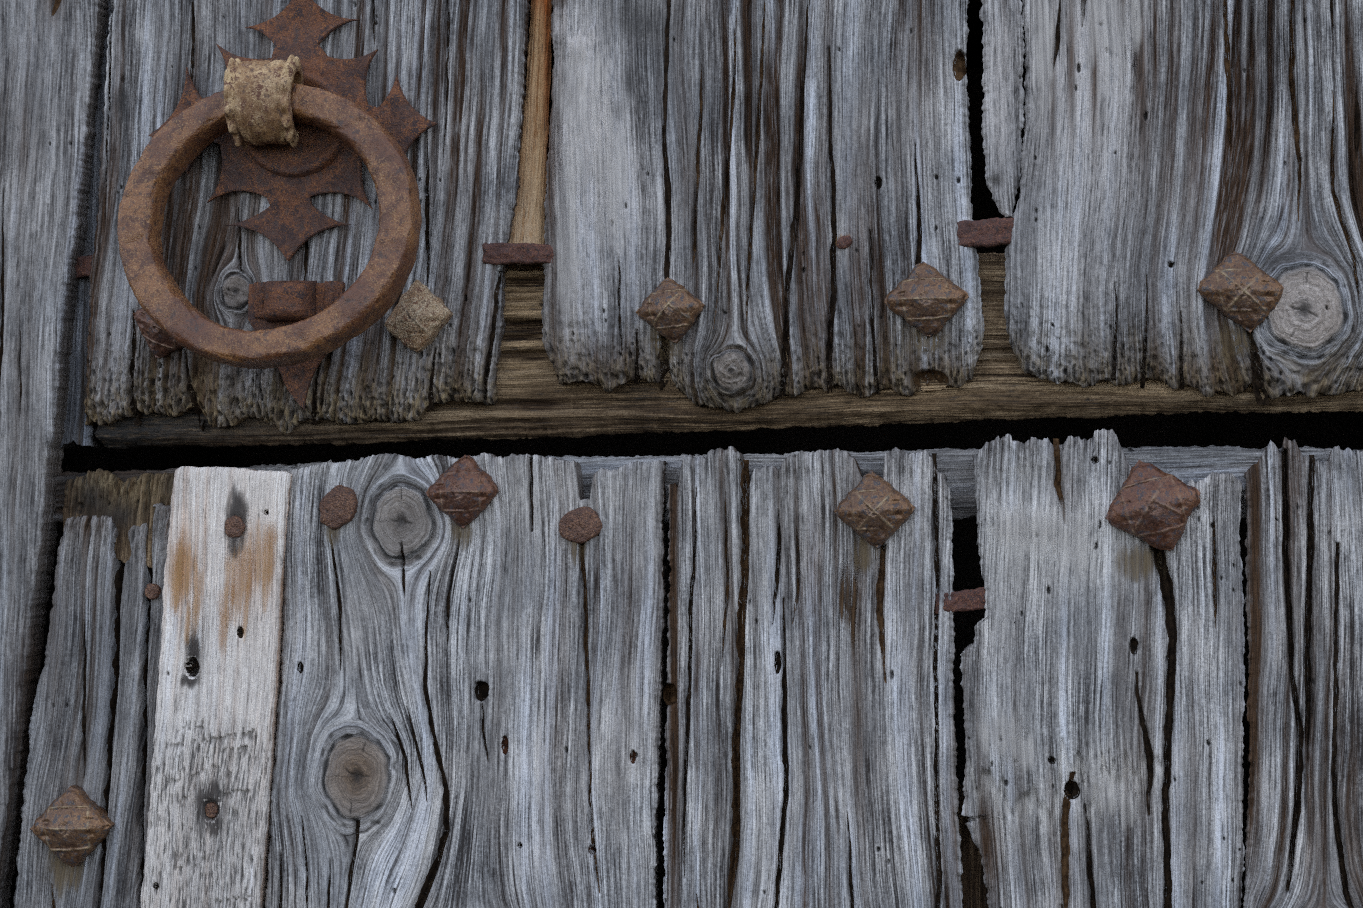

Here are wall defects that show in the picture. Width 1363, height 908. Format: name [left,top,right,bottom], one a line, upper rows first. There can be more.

crack [1135,547,1177,908]